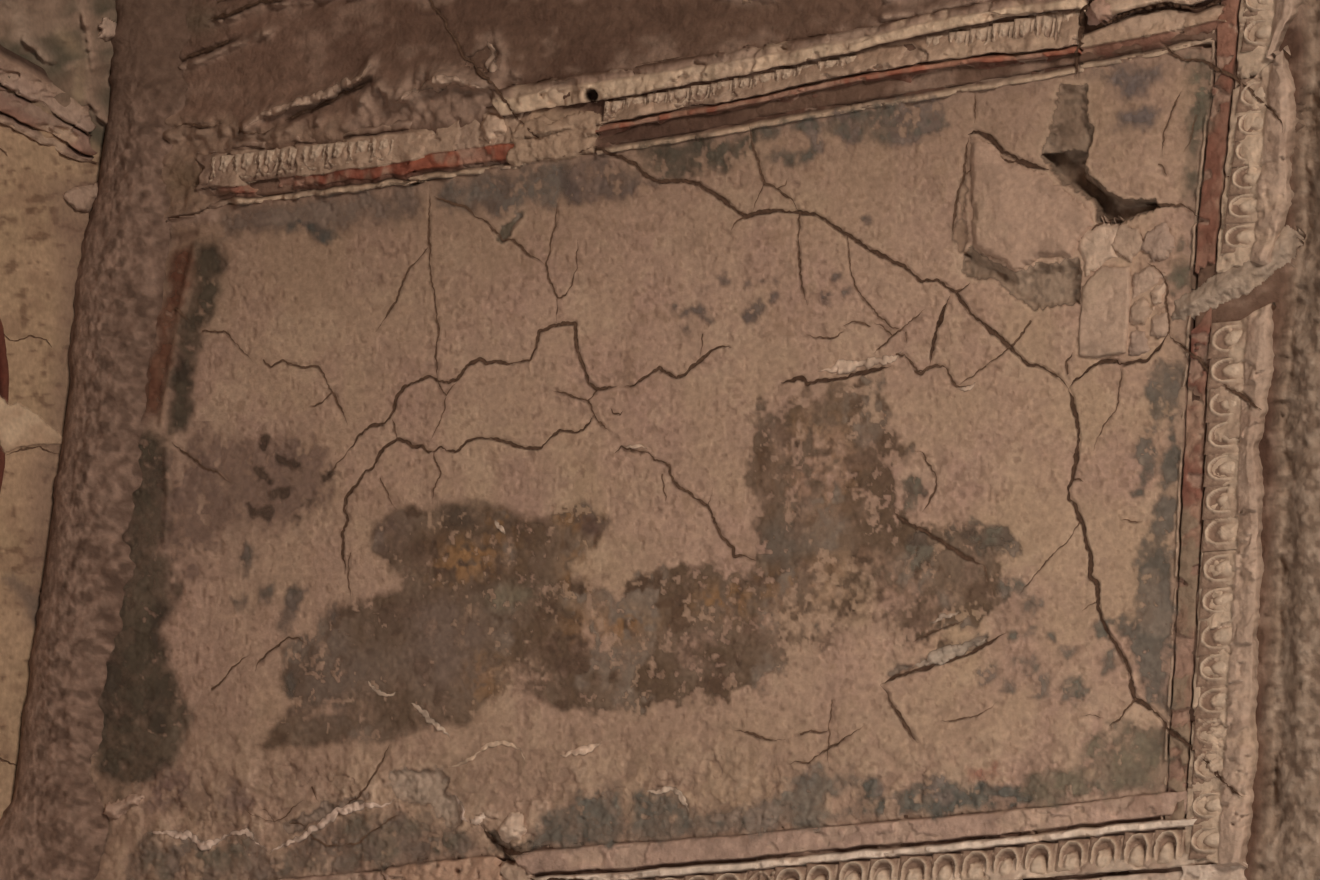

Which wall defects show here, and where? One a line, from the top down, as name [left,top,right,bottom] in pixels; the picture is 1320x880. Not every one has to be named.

flaking render [397,42,499,102]
crack [1162,43,1283,133]
flaking render [952,84,1160,311]
flaking render [0,397,63,452]
crack [173,192,754,596]
crack [429,0,1262,797]
leakage [904,476,928,509]
leakage [97,245,333,802]
leakage [946,518,1014,555]
crack [211,636,305,690]
crack [368,681,449,736]
crack [481,825,584,880]